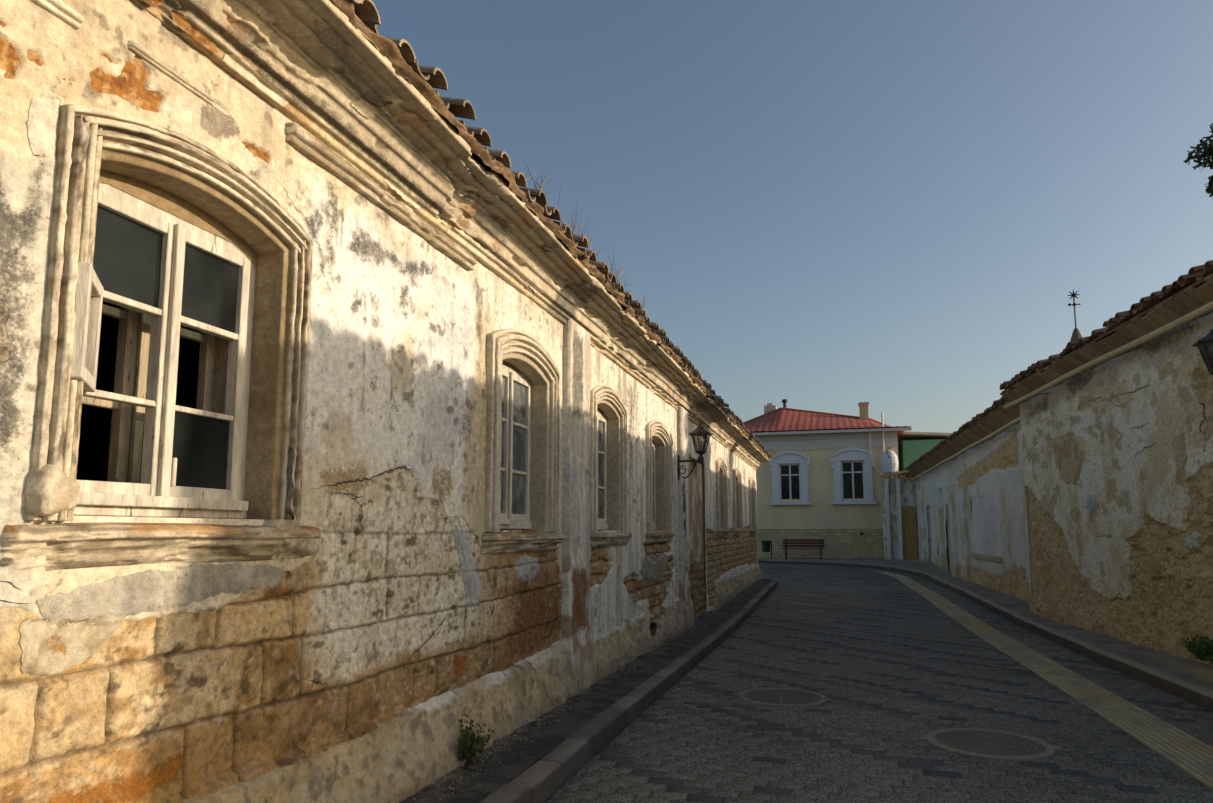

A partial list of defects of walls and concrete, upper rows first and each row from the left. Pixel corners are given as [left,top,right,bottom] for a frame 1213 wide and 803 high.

flaking render [0,20,43,79]
flaking render [90,52,167,113]
flaking render [239,138,270,164]
leakage [0,176,41,453]
leakage [307,182,338,278]
leakage [349,229,433,309]
flaking render [958,356,1213,666]
flaking render [0,468,561,803]
crack [310,466,482,666]
flaking render [590,547,611,587]
flaking render [623,543,675,636]
flaking render [706,526,757,606]